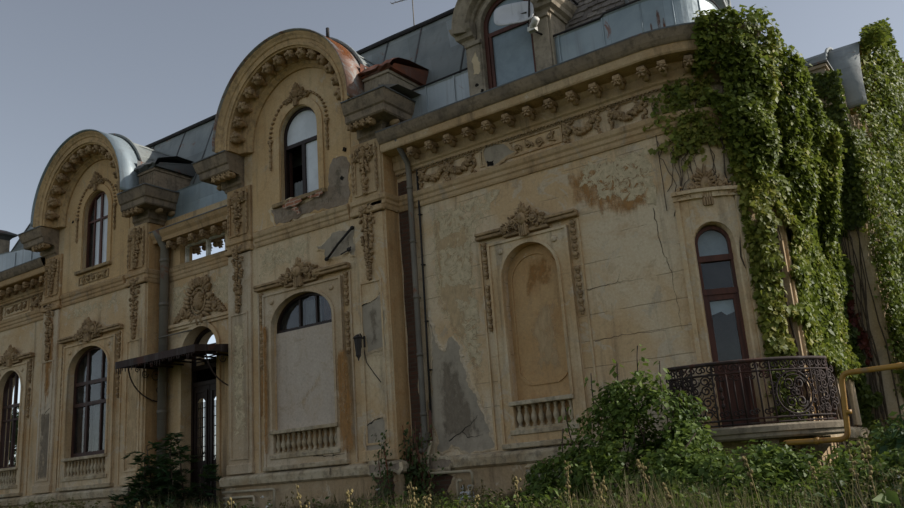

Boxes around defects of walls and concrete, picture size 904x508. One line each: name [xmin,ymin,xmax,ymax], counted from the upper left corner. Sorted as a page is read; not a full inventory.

flaking render [268,147,352,227]
peeling [579,146,657,205]
crack [595,208,682,342]
flaking render [398,210,496,460]
flaking render [414,474,457,503]